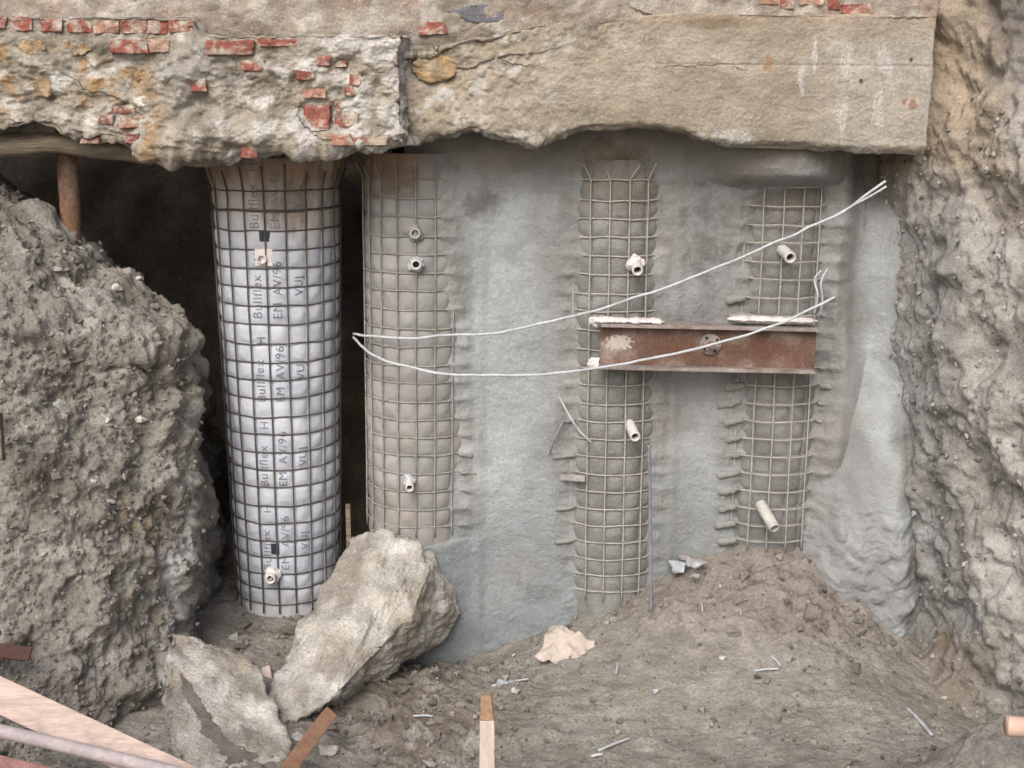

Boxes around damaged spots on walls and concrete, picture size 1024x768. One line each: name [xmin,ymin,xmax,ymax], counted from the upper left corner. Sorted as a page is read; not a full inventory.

spalling [0,16,197,55]
spalling [205,38,298,72]
crack [435,43,570,70]
damp [798,37,818,96]
damp [836,41,854,137]
damp [871,45,896,131]
spalling [0,122,55,133]
spalling [241,146,289,159]
spalling [0,153,60,215]
spalling [78,137,231,459]
spalling [296,55,404,541]
spalling [220,474,233,525]